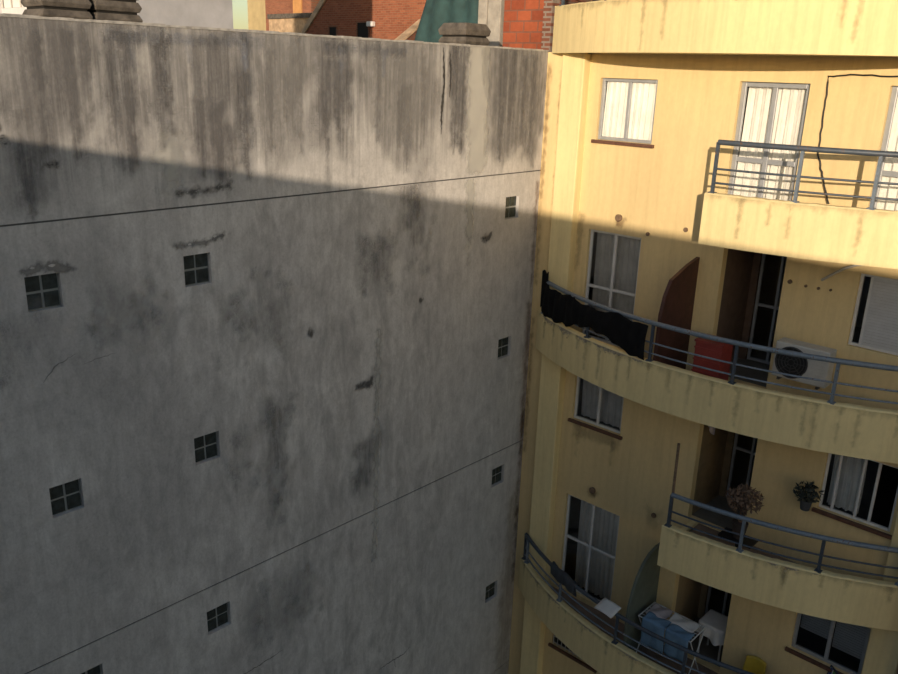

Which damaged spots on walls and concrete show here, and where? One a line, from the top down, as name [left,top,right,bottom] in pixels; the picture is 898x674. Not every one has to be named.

leakage [0,17,88,210]
leakage [105,24,146,159]
leakage [176,184,230,196]
leakage [195,32,251,174]
leakage [451,46,542,242]